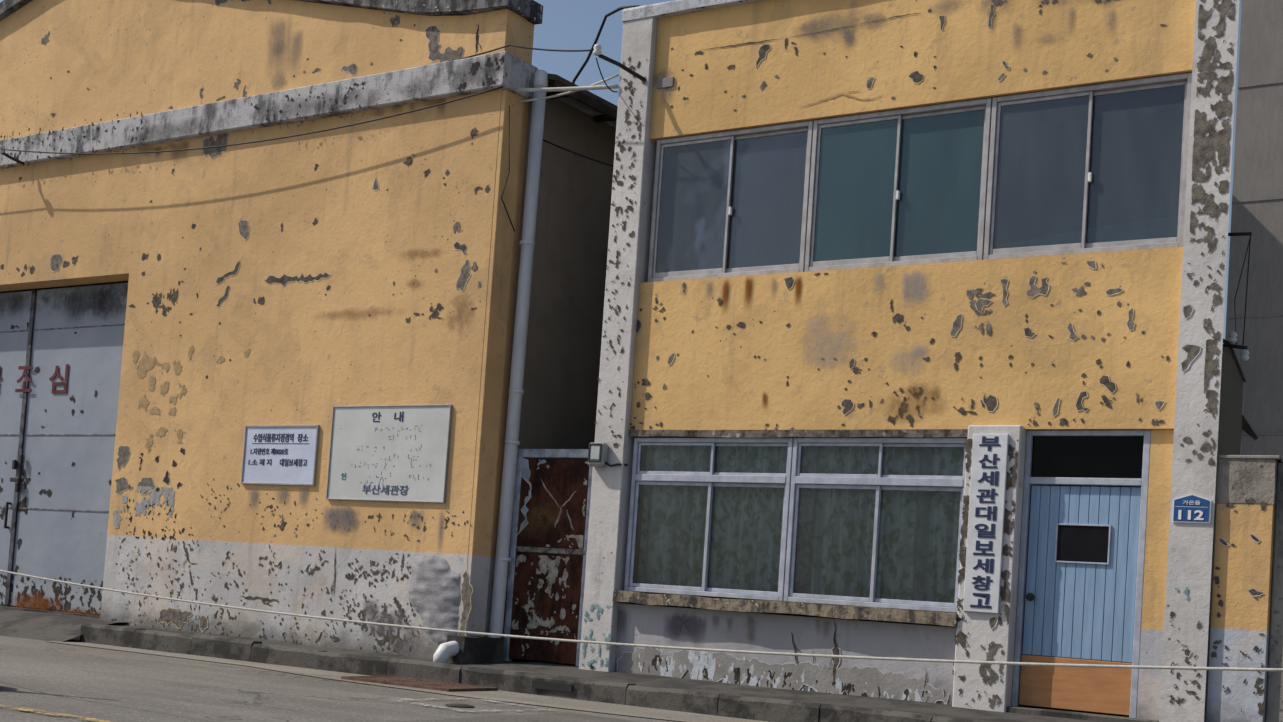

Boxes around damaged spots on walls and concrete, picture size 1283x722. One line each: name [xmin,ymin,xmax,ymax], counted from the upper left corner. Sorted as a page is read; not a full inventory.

spalling [199,62,373,129]
spalling [756,38,798,90]
peeling [0,112,146,181]
peeling [603,56,665,371]
peeling [1161,0,1235,465]
spalling [1023,260,1145,342]
peeling [594,378,666,447]
peeling [817,357,934,427]
spalling [953,356,998,415]
peeling [1028,359,1116,426]
peeling [0,261,473,655]
spalling [511,439,1018,708]